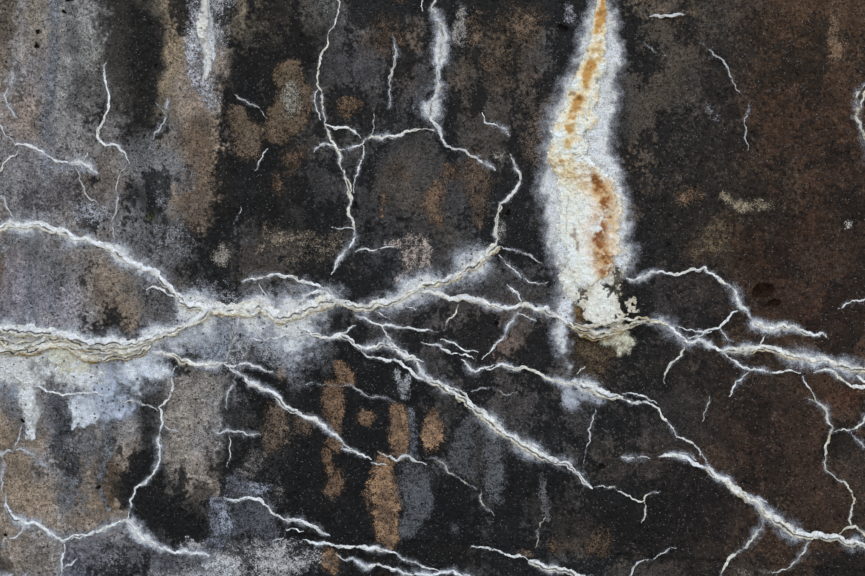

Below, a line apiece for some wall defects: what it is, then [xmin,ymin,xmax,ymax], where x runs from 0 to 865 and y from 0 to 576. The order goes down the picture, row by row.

crack [649,11,685,19]
crack [0,125,98,204]
crack [96,63,129,189]
crack [314,0,496,275]
water stain [520,0,640,410]
crack [710,50,749,150]
crack [855,85,865,140]
water stain [211,244,232,268]
water stain [0,201,173,519]
water stain [165,316,291,378]
crack [0,154,865,576]
water stain [65,532,142,576]